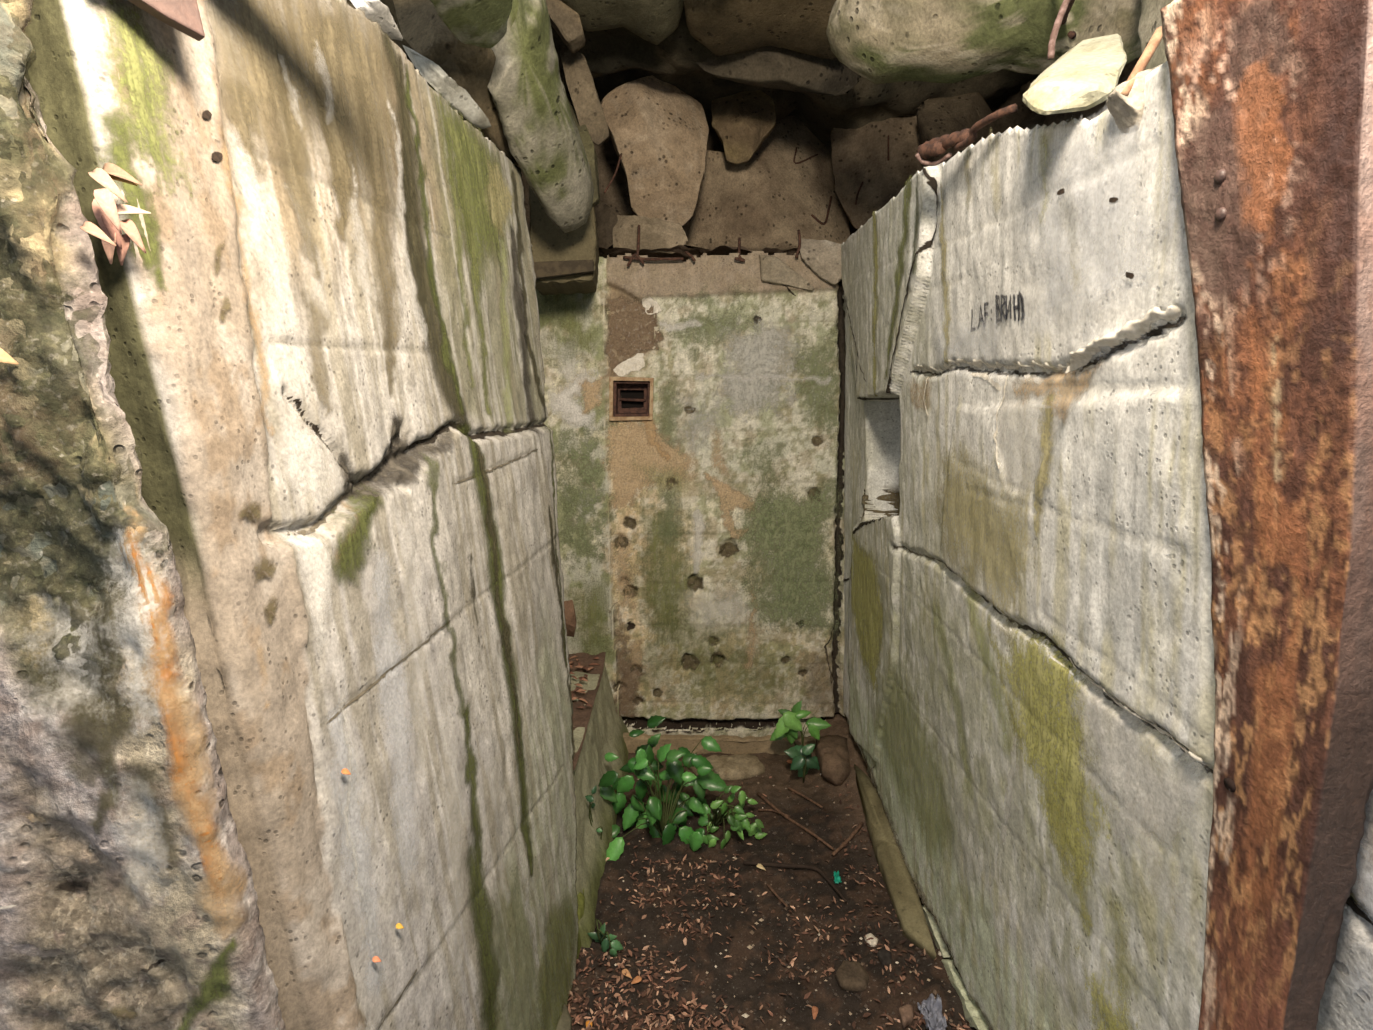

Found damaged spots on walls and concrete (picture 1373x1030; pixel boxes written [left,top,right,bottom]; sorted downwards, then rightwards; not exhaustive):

crack [282,393,376,535]
leakage [214,0,643,1030]
crack [406,421,547,484]
crack [622,168,1213,773]
corrosion [121,516,245,931]
leakage [968,589,1016,838]
crack [1346,892,1373,925]